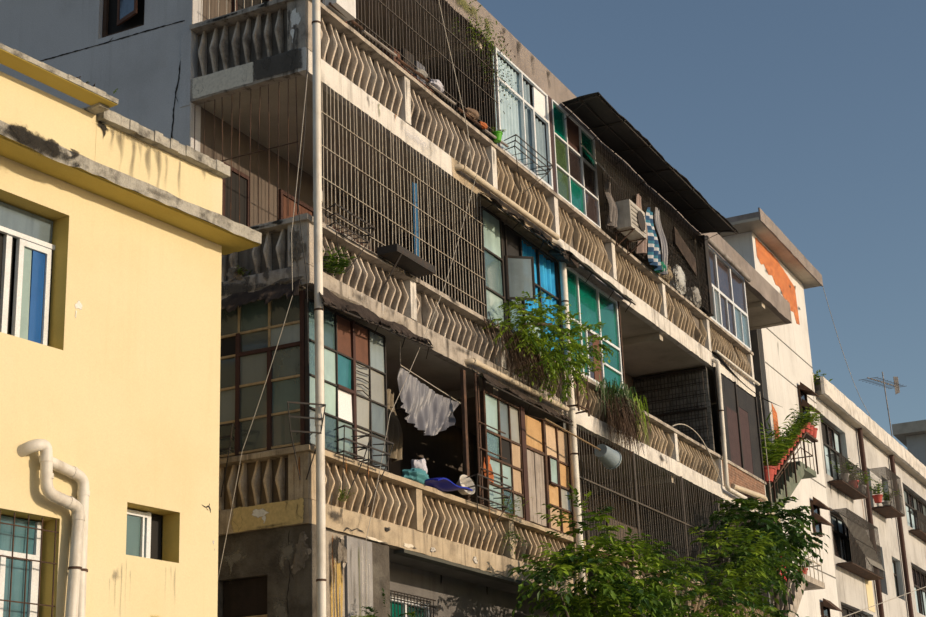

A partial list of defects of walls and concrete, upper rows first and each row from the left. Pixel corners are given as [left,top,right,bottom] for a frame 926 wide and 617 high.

crack [171,60,181,139]
mould [5,124,88,167]
flaking render [755,238,800,325]
peeling [231,498,312,574]
leakage [330,536,343,587]